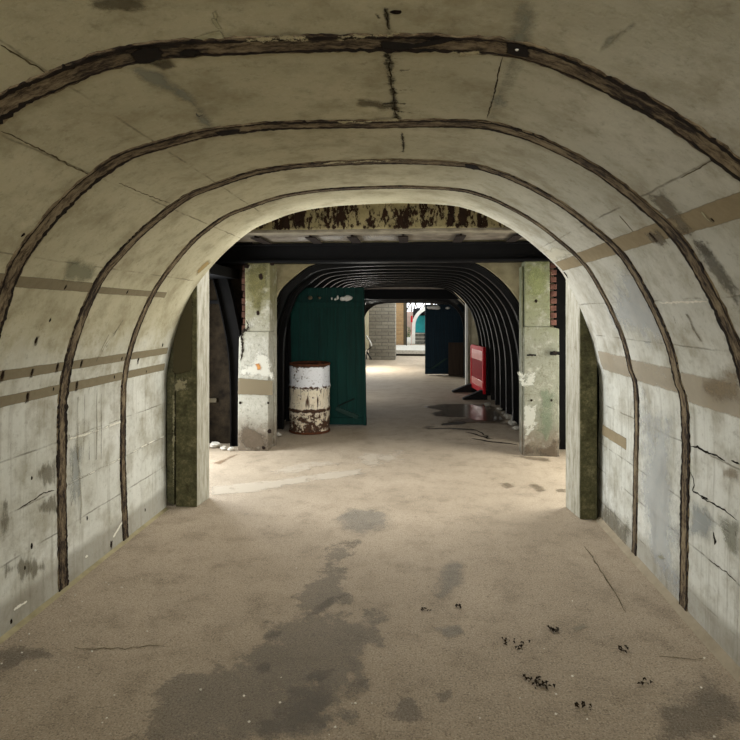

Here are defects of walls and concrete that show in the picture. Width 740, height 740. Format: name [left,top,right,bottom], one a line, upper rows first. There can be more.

crack [376,9,390,30]
crack [487,57,503,117]
crack [383,53,405,152]
peeling [241,353,273,379]
peeling [519,372,536,387]
leakage [427,418,502,430]
peeling [524,404,537,436]
crack [691,445,739,464]
crack [690,472,736,536]
crack [586,549,625,611]
crack [75,643,159,651]